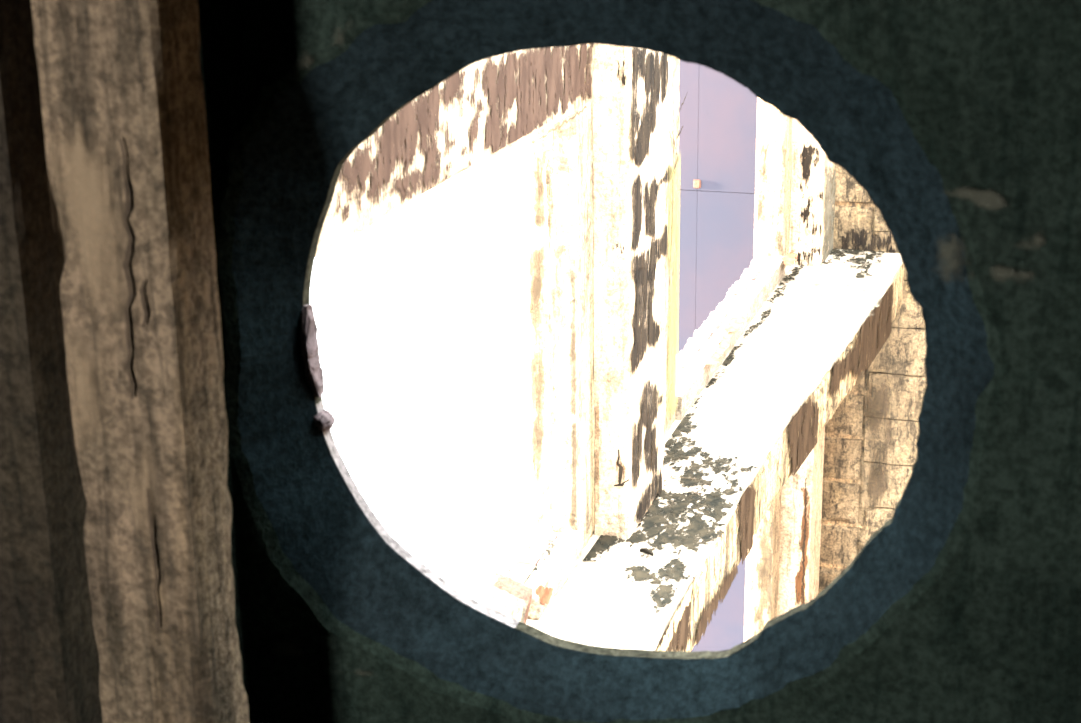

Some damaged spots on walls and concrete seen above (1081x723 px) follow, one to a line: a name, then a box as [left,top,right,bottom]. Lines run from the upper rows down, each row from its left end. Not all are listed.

water stain [528,245,546,484]
water stain [532,157,544,227]
water stain [613,48,668,374]
water stain [633,377,763,523]
water stain [690,134,895,411]